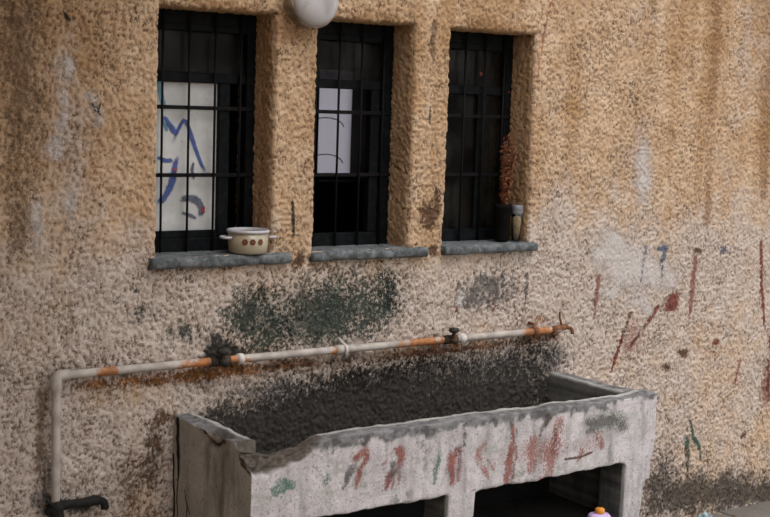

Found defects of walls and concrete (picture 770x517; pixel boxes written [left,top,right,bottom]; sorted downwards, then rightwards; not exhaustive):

damp [166,252,409,361]
rust [78,333,558,392]
damp [199,342,566,454]